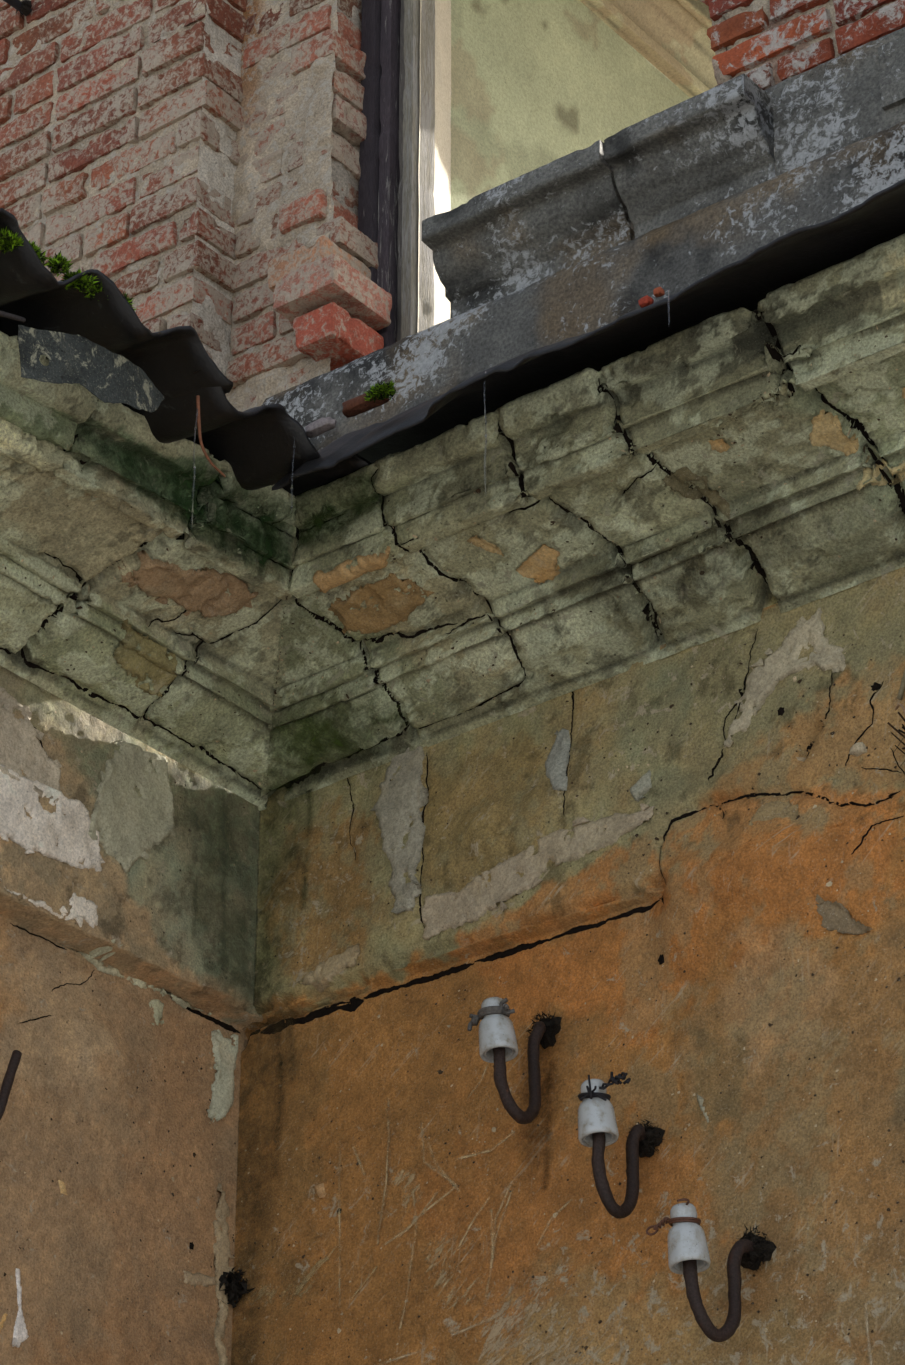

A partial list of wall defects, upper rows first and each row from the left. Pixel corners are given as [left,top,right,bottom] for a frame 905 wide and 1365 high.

flaking render [114,548,259,635]
crack [0,468,526,928]
flaking render [306,519,467,690]
crack [498,422,662,637]
crack [597,379,778,603]
flaking render [714,608,872,762]
crack [752,310,905,514]
crack [10,923,67,950]
crack [19,971,93,1023]
flaking render [56,903,239,1159]
flaking render [355,713,682,940]
crack [186,630,905,1041]